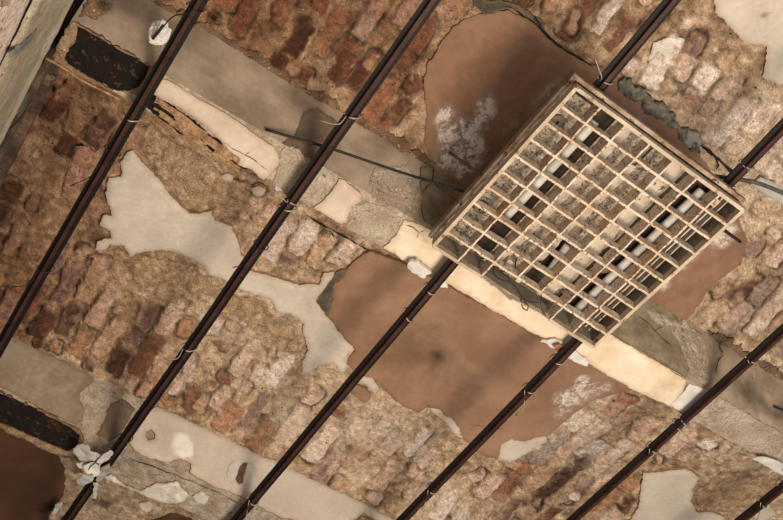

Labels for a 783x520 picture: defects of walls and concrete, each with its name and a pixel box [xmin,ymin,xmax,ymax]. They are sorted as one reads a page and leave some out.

crack [504,6,593,67]
flaking render [713,0,783,86]
flaking render [96,22,340,303]
spalling [300,164,448,277]
damp [435,97,497,178]
spalling [470,80,731,317]
flaking render [221,267,354,374]
flaking render [446,240,574,352]
damp [554,375,610,415]
flaking render [576,307,749,413]
spalling [699,397,783,463]
flaking render [628,466,777,520]